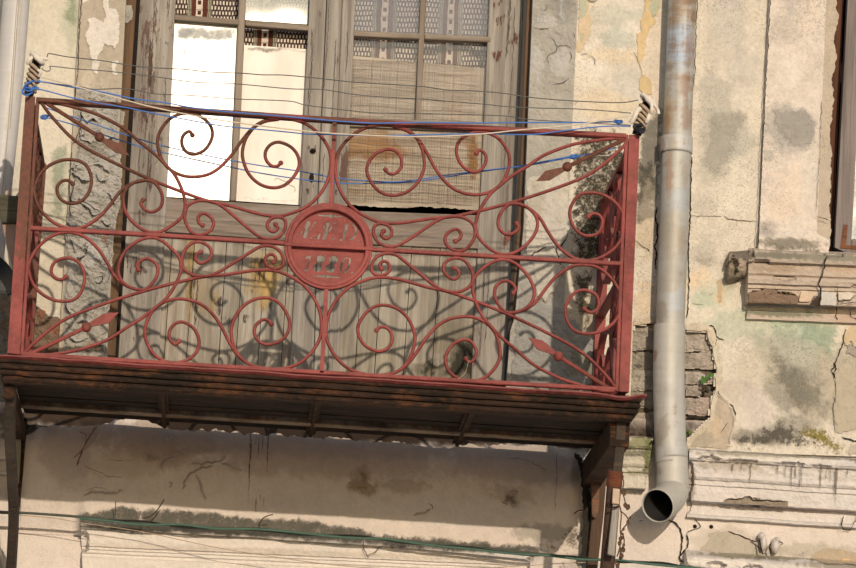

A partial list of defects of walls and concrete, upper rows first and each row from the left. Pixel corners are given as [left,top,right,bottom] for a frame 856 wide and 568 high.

peeling [85,0,133,74]
peeling [637,0,661,62]
damp [774,109,815,146]
damp [571,130,623,259]
flaking render [0,291,11,355]
damp [573,271,592,331]
flaking render [625,316,656,419]
flaking render [685,322,736,450]
crack [818,255,856,442]
damp [140,509,541,553]
crack [669,518,701,563]
crack [728,531,783,555]